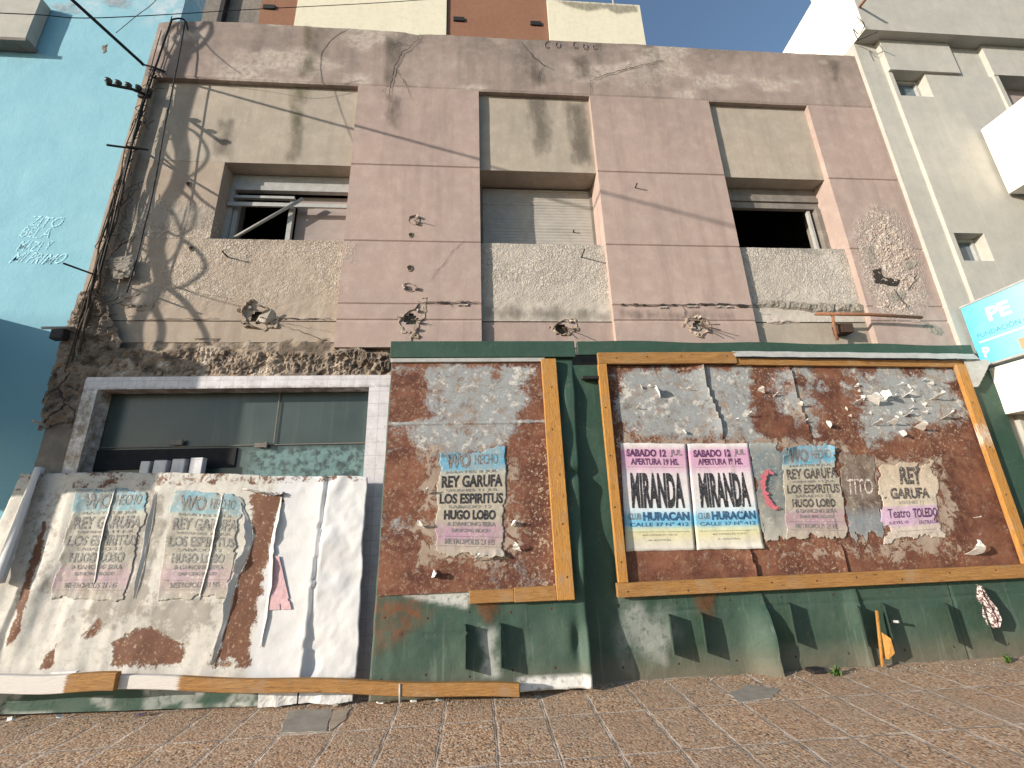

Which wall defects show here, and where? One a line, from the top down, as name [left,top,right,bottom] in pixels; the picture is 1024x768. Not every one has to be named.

crack [383,34,421,98]
flaking render [753,212,928,324]
spalling [397,283,427,341]
hole [548,318,579,336]
spalling [682,315,721,339]
flaking render [37,289,391,431]